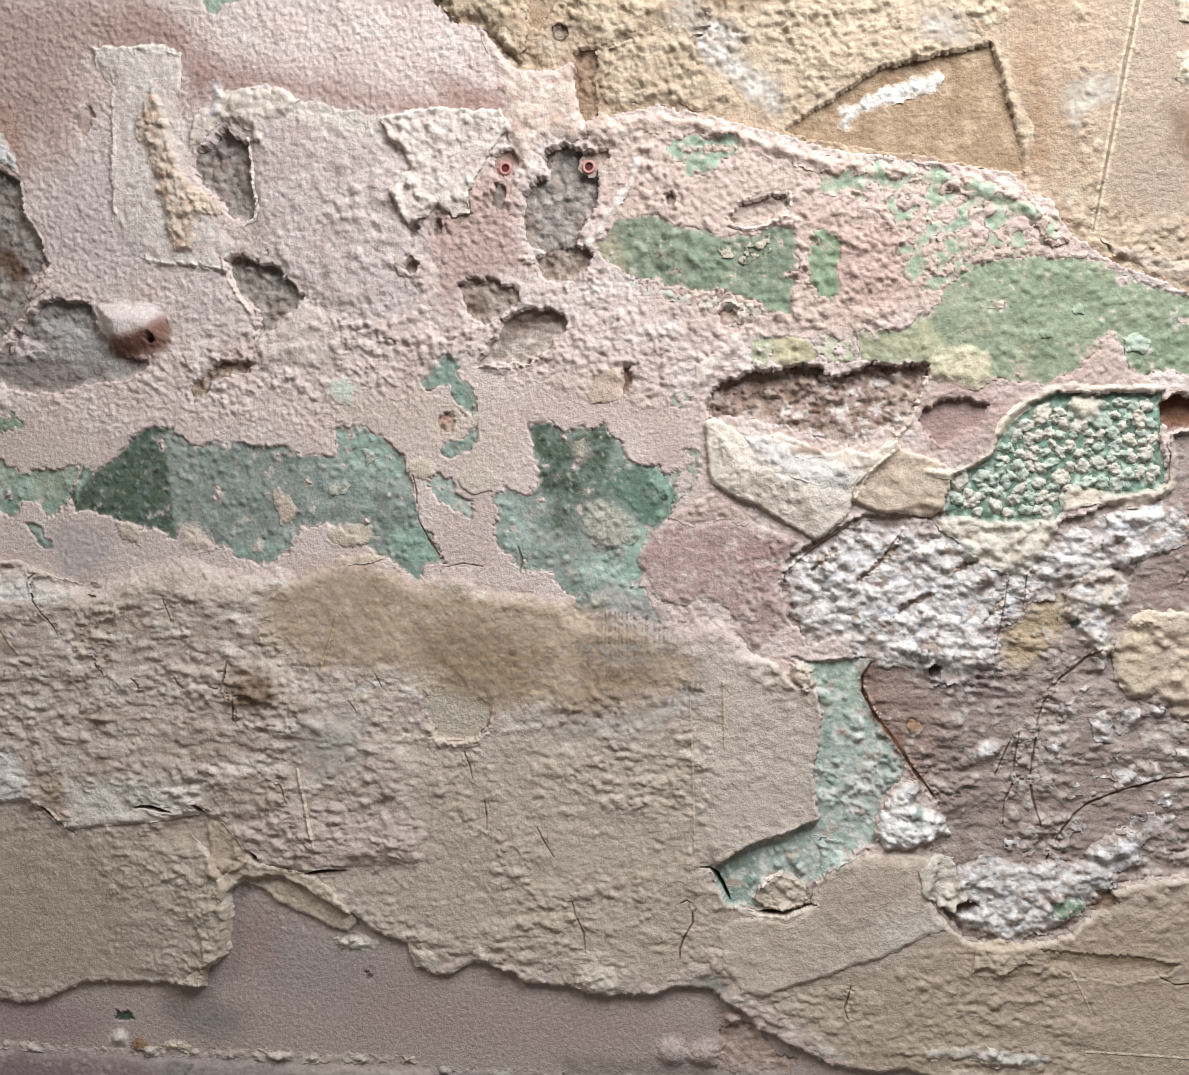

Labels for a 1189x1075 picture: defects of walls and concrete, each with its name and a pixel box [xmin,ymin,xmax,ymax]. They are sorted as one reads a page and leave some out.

crack [1088,0,1145,237]
peeling [0,410,24,434]
spalling [0,128,149,395]
corrosion [111,324,169,358]
spalling [90,0,1189,577]
damp [285,577,699,738]
peeling [0,420,1189,1075]
crack [990,645,1189,865]